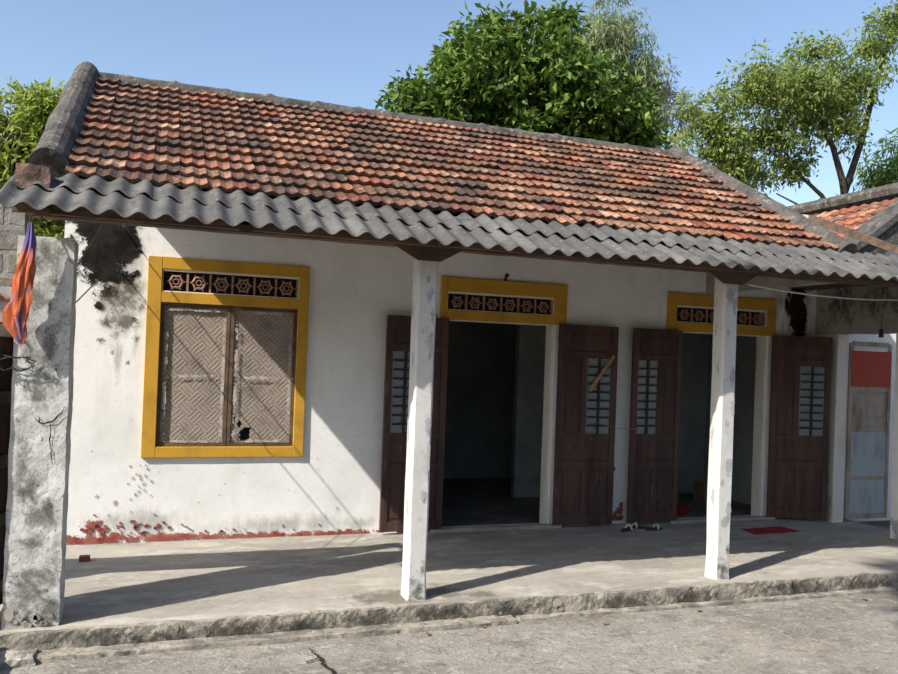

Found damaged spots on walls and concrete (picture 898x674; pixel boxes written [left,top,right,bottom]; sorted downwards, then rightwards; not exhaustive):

damp [61,220,145,344]
damp [22,325,61,401]
crack [34,407,65,465]
damp [12,437,58,530]
peeling [66,511,379,545]
crack [306,649,336,674]